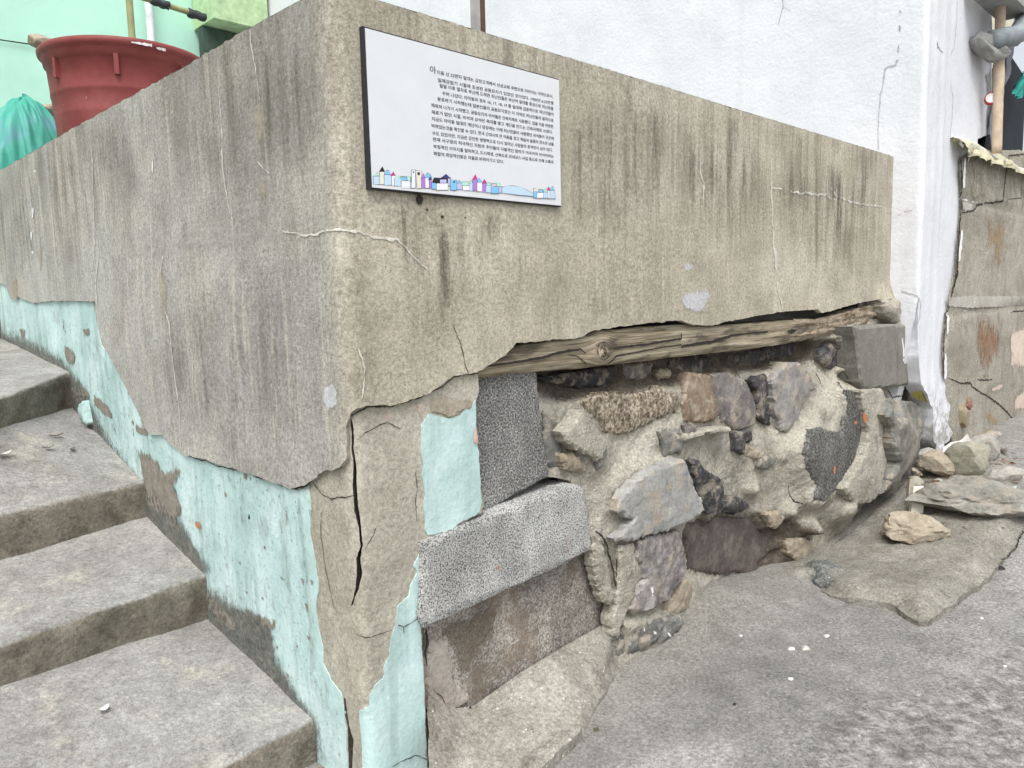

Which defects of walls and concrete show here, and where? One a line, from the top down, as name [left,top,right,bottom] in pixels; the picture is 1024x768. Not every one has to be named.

crack [877,60,899,150]
crack [282,228,429,271]
crack [770,161,883,309]
crack [901,88,1024,418]
peeling [58,347,75,365]
peeling [71,385,112,418]
crack [160,256,478,607]
peeling [139,451,181,527]